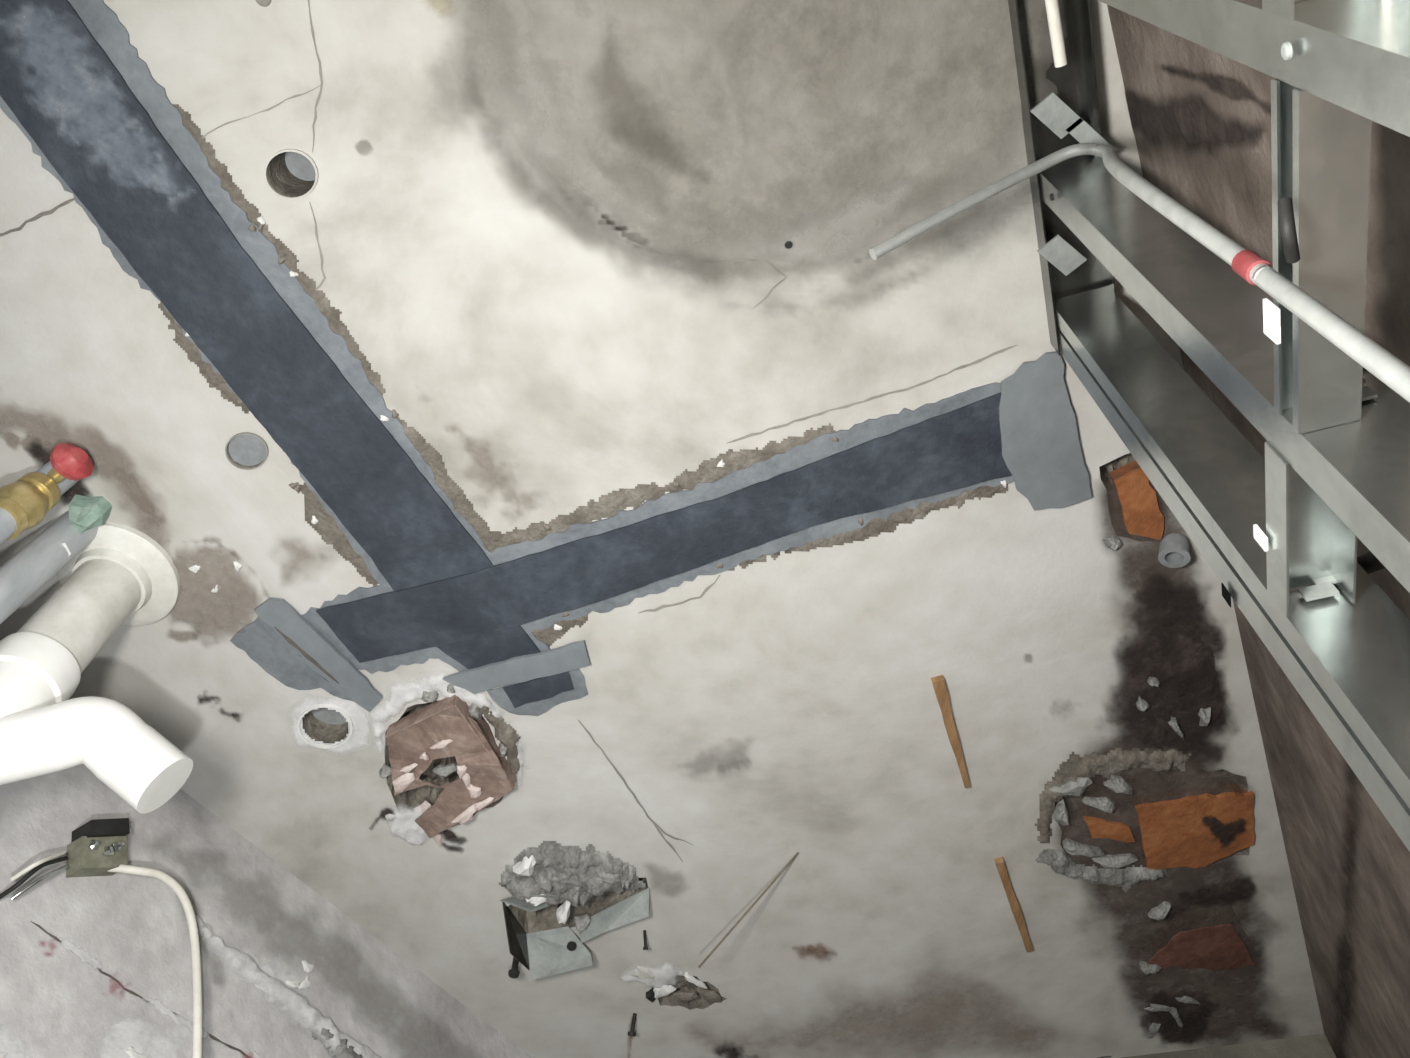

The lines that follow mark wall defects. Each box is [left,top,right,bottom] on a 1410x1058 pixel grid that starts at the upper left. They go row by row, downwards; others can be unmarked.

crack [202,0,323,153]
leakage [1125,67,1271,151]
crack [0,198,75,237]
crack [309,202,326,291]
spalling [1099,453,1164,551]
spalling [370,675,523,848]
spalling [1035,575,1255,892]
spalling [508,878,648,934]
spalling [1139,878,1255,975]
peeling [1144,996,1200,1039]